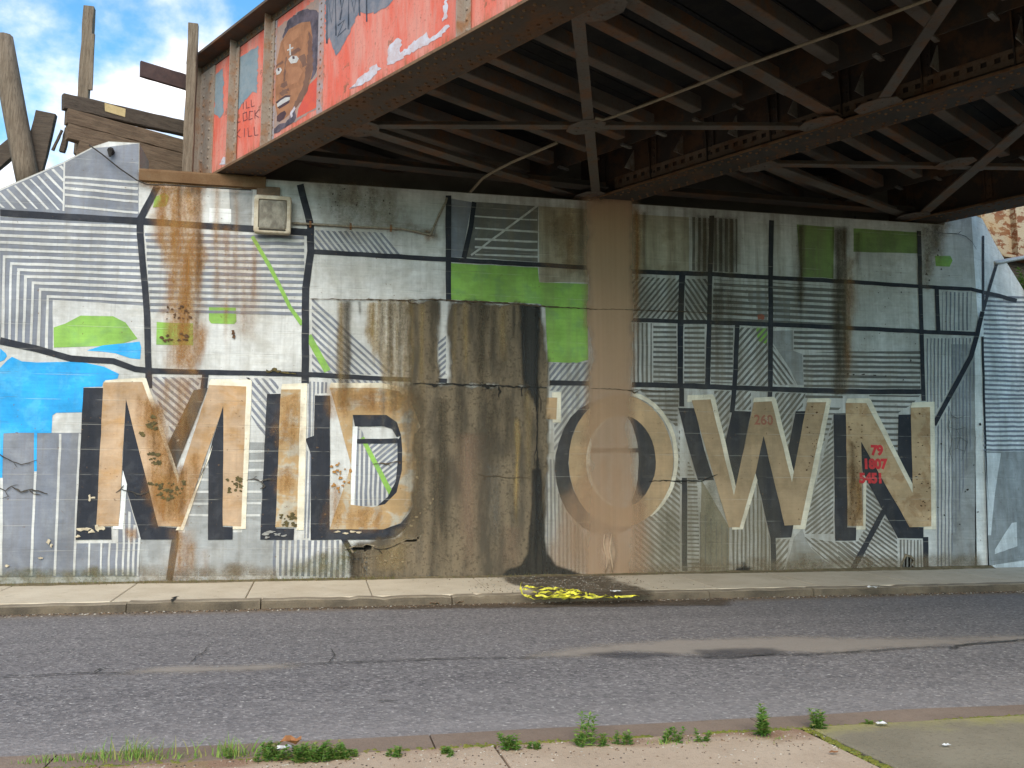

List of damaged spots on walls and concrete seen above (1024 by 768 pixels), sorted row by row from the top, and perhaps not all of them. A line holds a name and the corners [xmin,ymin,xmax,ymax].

crack [0,454,48,499]
rust [145,182,205,371]
water stain [337,303,350,404]
water stain [366,301,423,466]
peeling [335,300,549,578]
crack [413,372,547,479]
crack [591,387,673,395]
crack [649,474,718,484]
water stain [834,229,847,393]